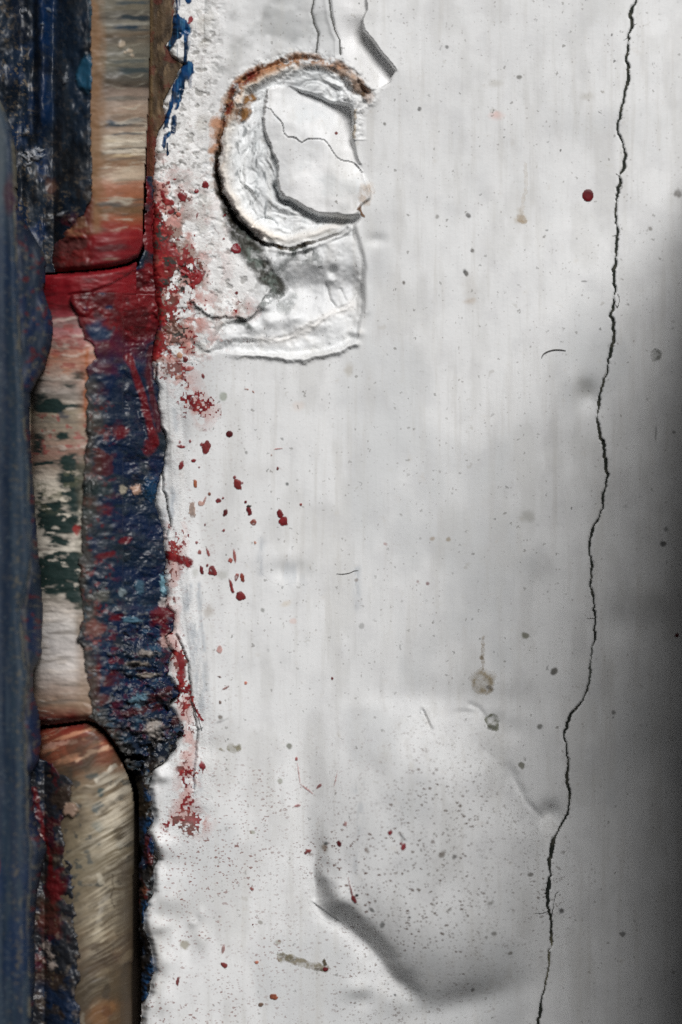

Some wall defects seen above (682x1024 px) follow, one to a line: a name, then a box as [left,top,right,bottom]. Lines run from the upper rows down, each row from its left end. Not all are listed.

corrosion [210,53,366,226]
crack [536,0,637,1024]
peeling [127,737,177,1002]